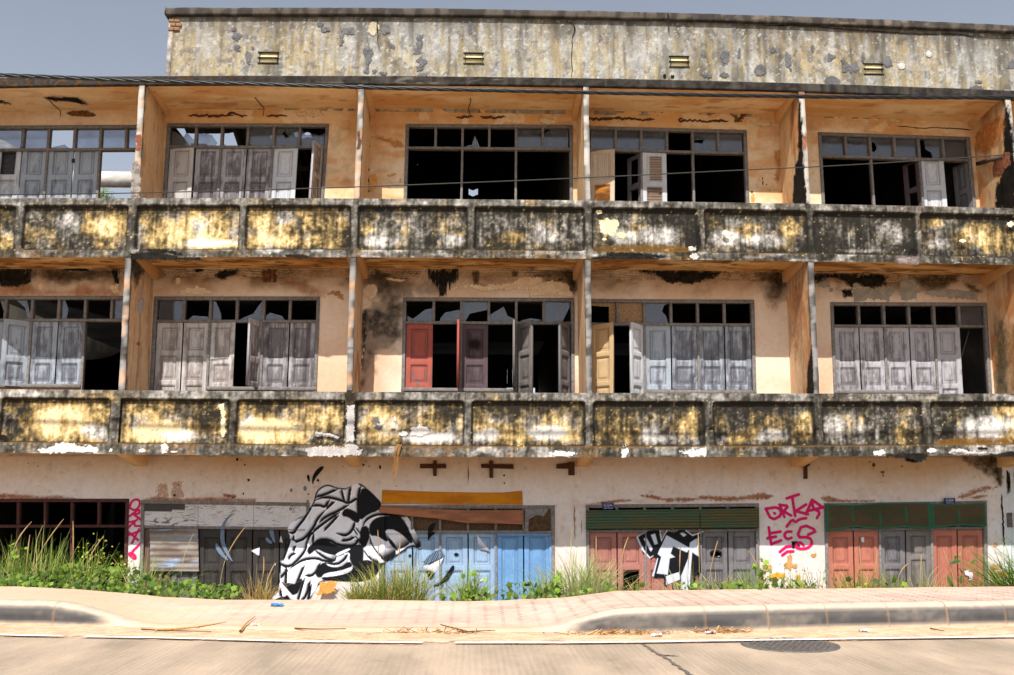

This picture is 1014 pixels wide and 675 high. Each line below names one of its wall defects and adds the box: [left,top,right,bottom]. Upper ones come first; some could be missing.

peeling [701,48,741,78]
peeling [754,64,766,76]
peeling [824,51,866,84]
damp [995,105,1014,208]
peeling [38,442,113,454]
damp [964,455,1011,493]